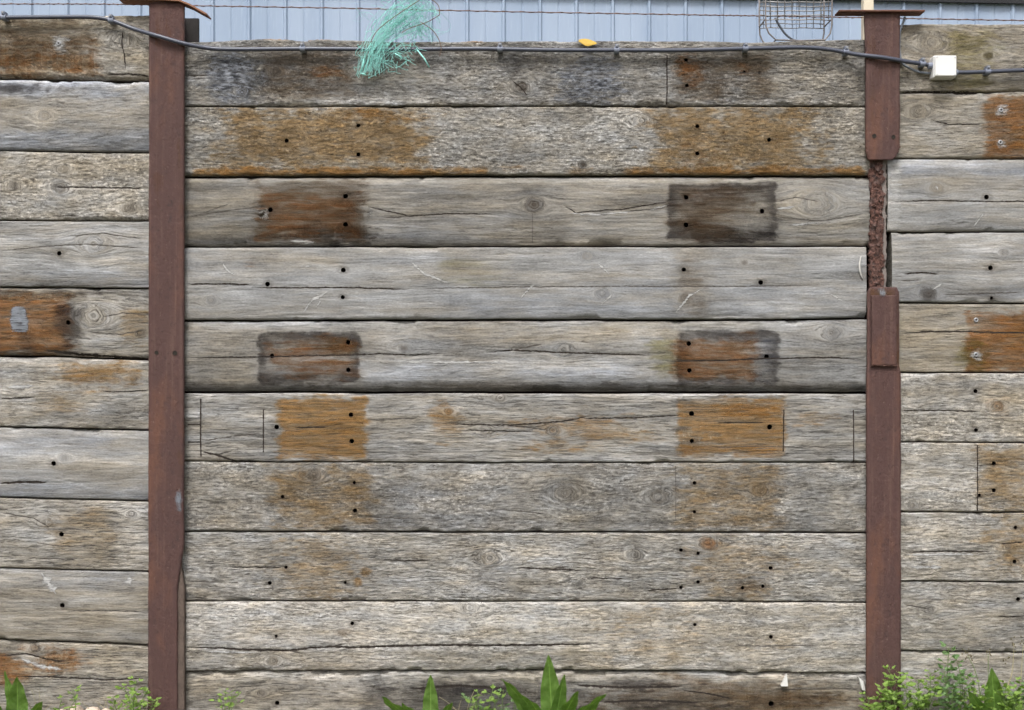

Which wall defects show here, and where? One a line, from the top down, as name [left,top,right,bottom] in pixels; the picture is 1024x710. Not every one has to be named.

crack [568,201,673,213]
rust [866,160,886,291]
rust [10,307,28,332]